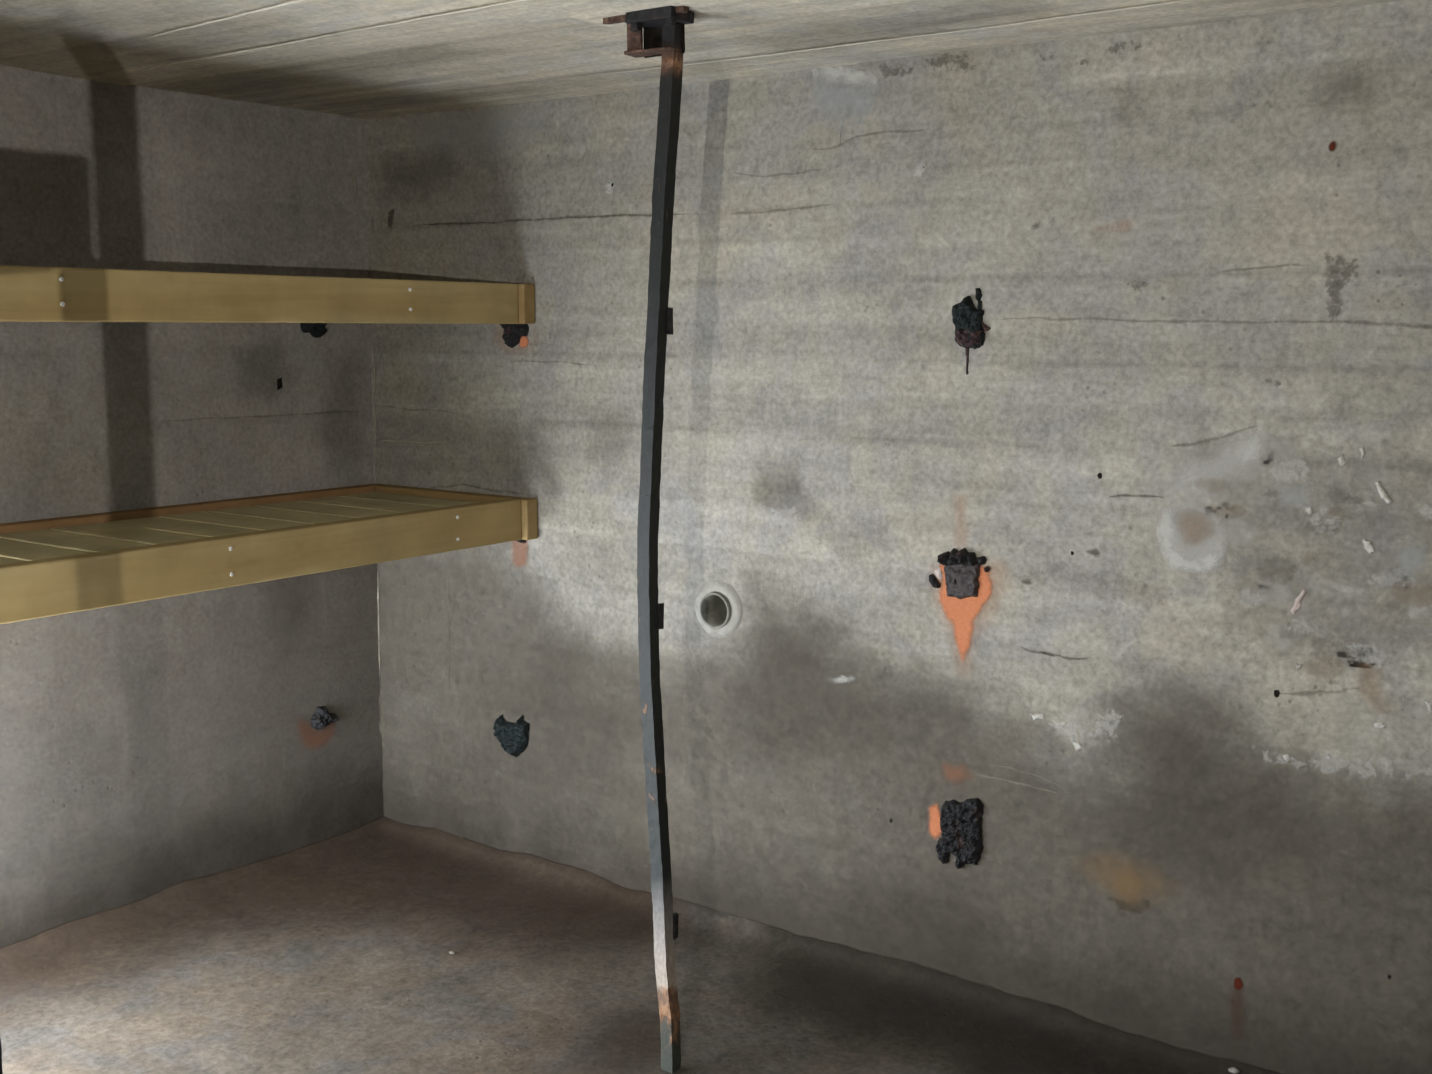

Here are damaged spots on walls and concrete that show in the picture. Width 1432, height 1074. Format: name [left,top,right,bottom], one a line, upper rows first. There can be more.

peeling [955,329,984,348]
leakage [0,551,653,984]
rust [940,564,991,659]
leakage [660,631,1432,1074]